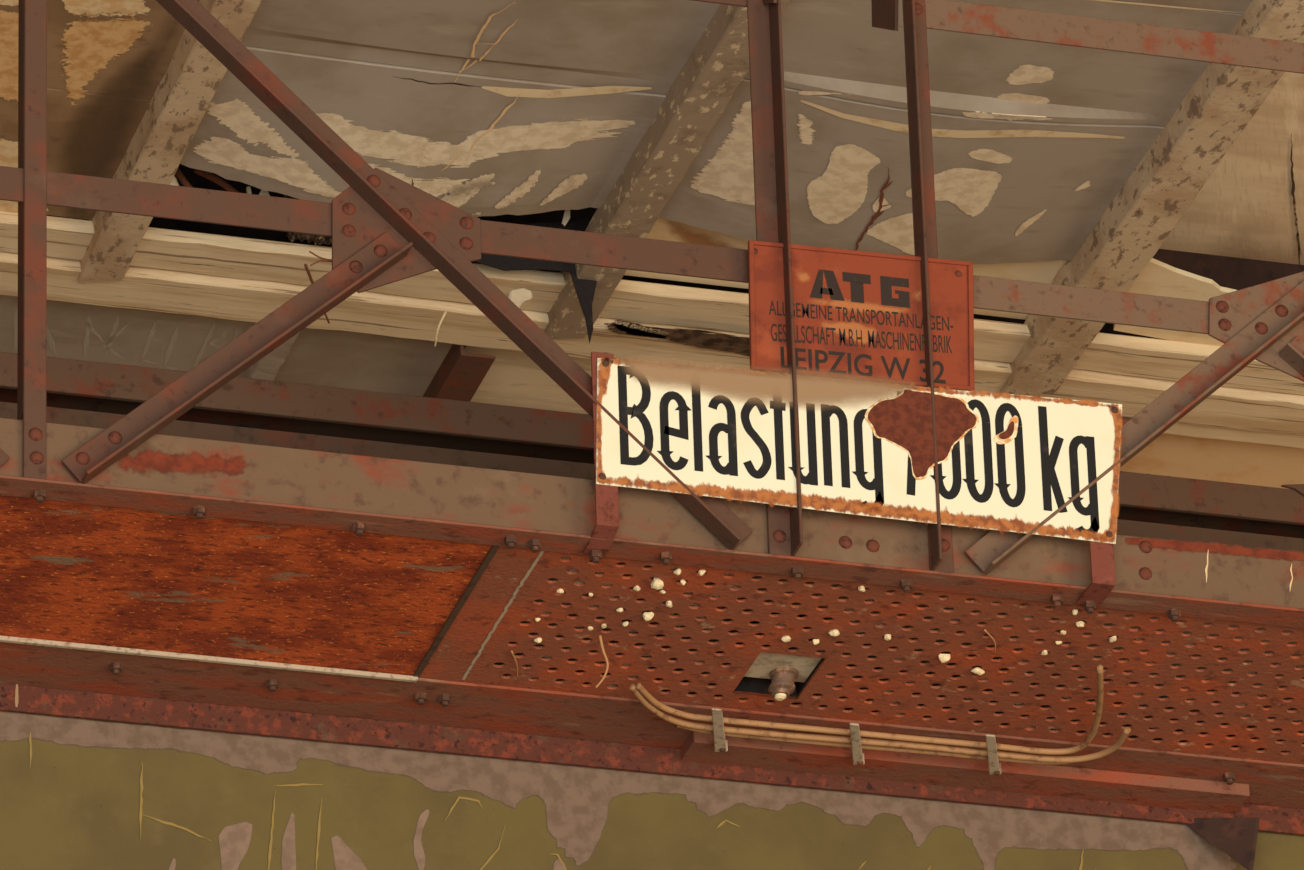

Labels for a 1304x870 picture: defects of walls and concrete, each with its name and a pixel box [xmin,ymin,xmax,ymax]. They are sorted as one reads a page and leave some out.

peeling [192,98,342,198]
peeling [315,113,636,215]
peeling [690,100,755,207]
peeling [796,114,817,146]
peeling [807,144,915,256]
crack [855,168,893,250]
peeling [934,149,1013,217]
peeling [962,64,1055,121]
peeling [1015,209,1047,236]
corrosion [120,450,245,475]
peeling [0,711,1237,870]